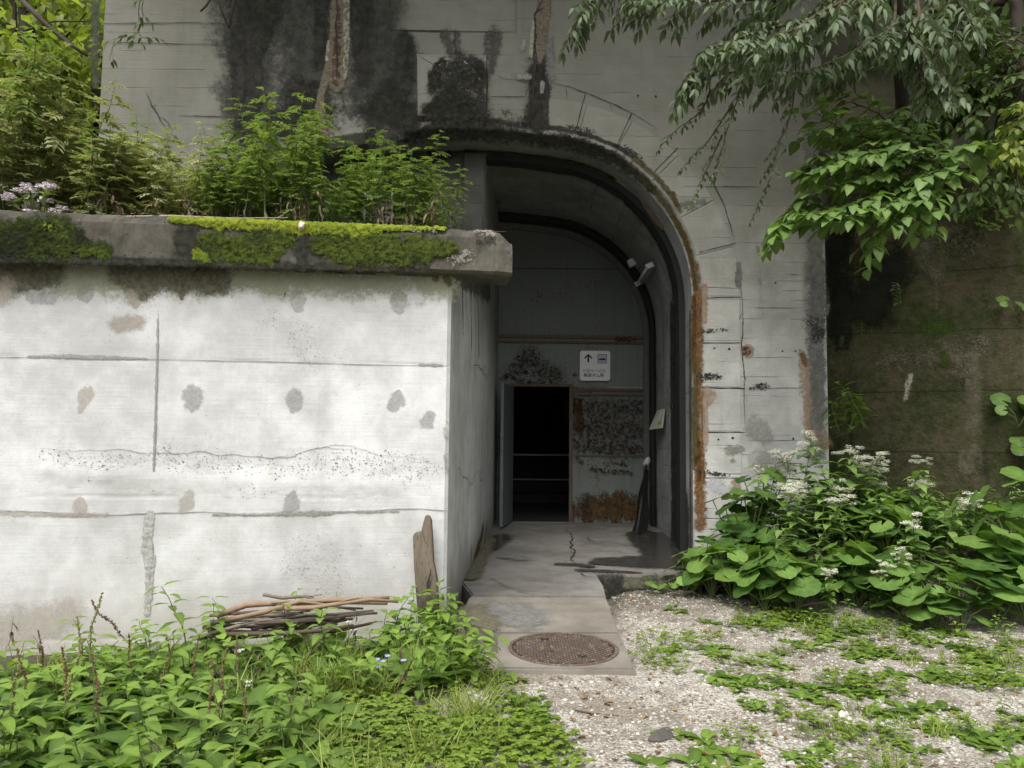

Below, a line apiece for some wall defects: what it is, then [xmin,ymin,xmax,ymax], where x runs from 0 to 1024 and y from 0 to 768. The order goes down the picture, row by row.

water stain [211,0,503,170]
water stain [484,25,512,79]
water stain [520,37,556,132]
water stain [801,96,829,212]
water stain [0,249,491,384]
water stain [427,149,716,590]
corrosion [673,221,709,532]
corrosion [799,350,830,449]
water stain [801,218,917,460]
crack [565,528,631,577]
corrosion [568,490,638,523]